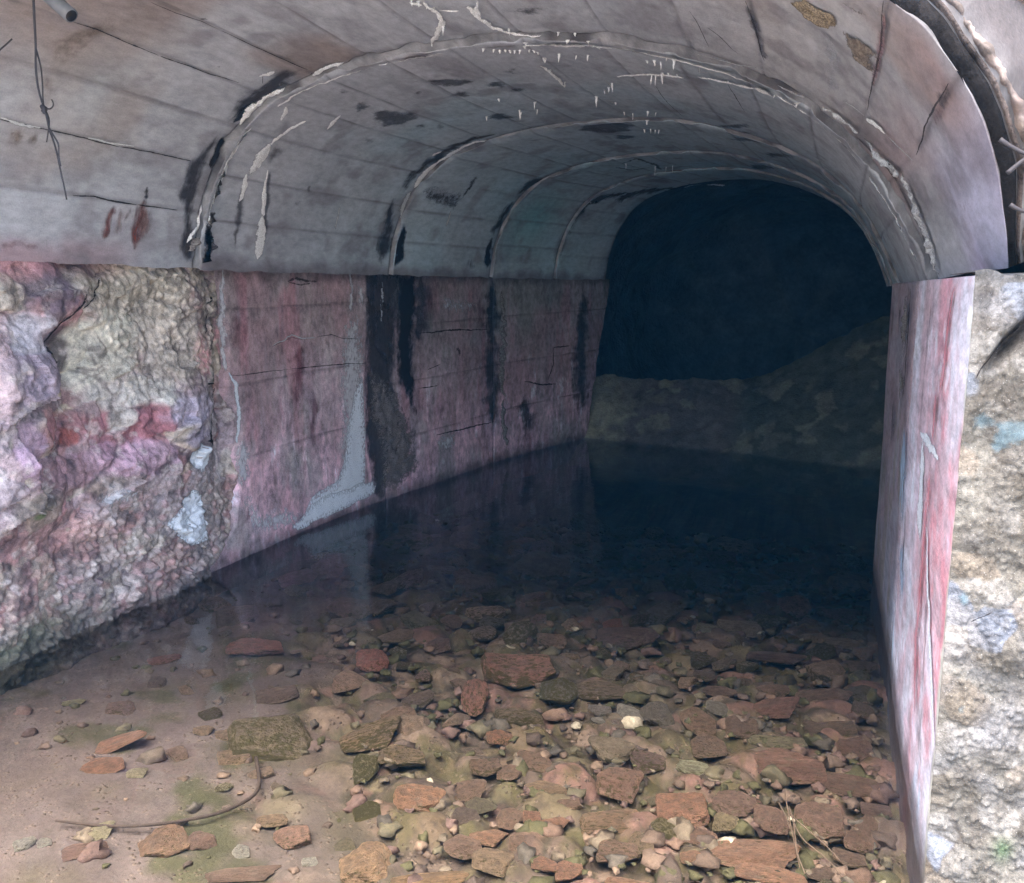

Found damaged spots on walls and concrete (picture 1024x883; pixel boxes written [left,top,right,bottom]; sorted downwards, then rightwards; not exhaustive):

crack [409,0,686,115]
spalling [791,0,874,71]
crack [867,5,885,110]
corrosion [103,208,121,238]
crack [73,195,175,210]
corrosion [132,188,149,247]
spalling [188,212,218,263]
water stain [179,53,442,259]
crack [916,84,948,154]
water stain [244,134,494,530]
water stain [484,283,502,423]
water stain [572,293,589,409]